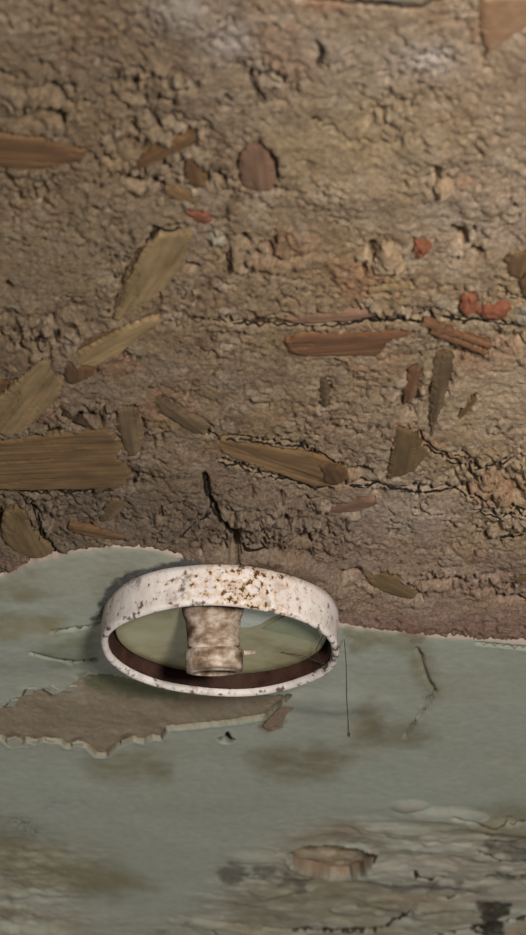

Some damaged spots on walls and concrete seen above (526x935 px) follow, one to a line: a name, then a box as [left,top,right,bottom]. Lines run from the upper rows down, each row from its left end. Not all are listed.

crack [318,0,434,9]
spalling [0,0,526,640]
crack [180,432,526,552]
peeling [0,674,294,752]
crack [407,648,435,733]
leakage [217,865,311,891]
spalling [285,845,388,866]
crack [270,870,471,934]
crack [438,915,526,935]
leakage [474,902,512,935]